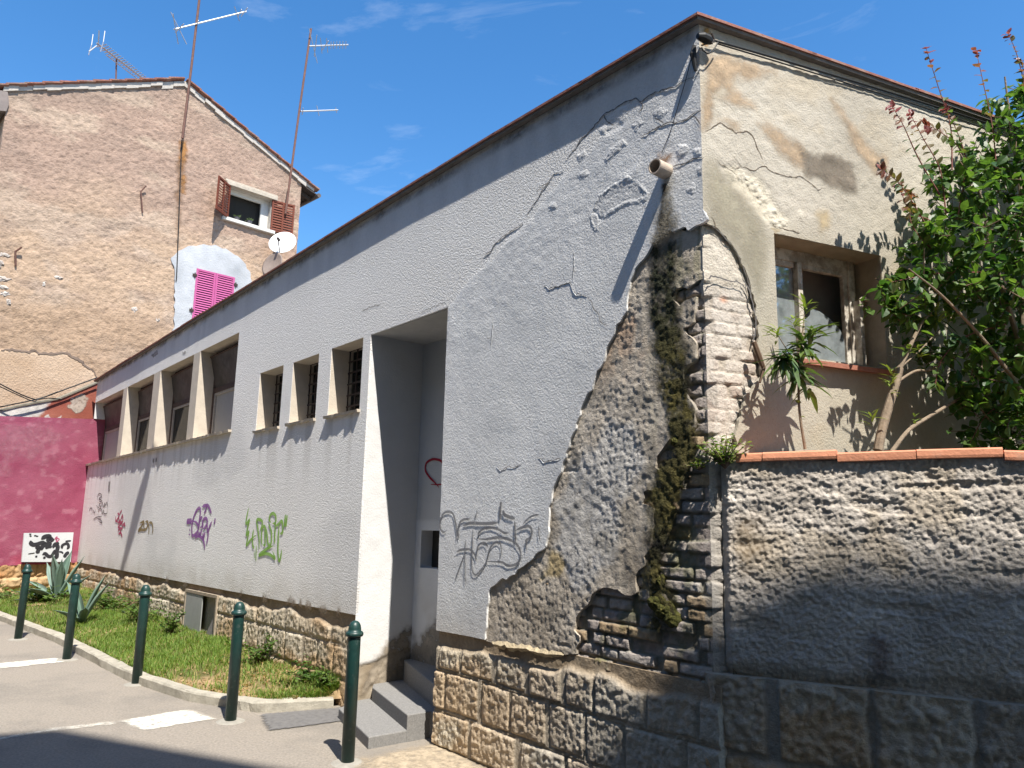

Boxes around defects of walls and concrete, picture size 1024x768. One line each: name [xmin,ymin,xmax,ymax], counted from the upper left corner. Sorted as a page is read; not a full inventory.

crack [482,71,822,259]
damp [766,128,856,191]
damp [653,183,677,243]
crack [544,252,606,325]
peeling [485,223,759,683]